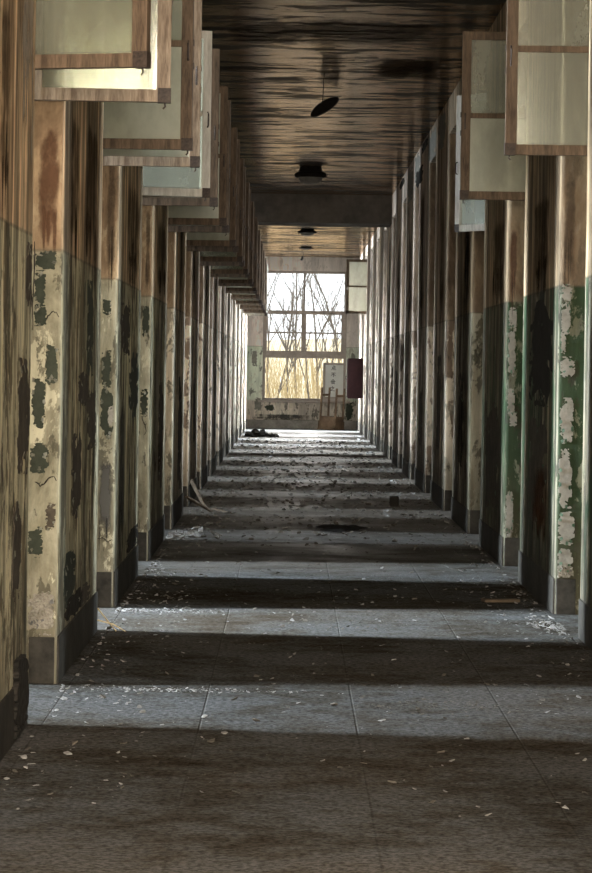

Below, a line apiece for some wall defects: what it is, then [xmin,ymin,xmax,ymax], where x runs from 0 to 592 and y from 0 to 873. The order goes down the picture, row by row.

peeling [17,344,58,474]
peeling [26,242,57,326]
peeling [71,279,164,519]
peeling [485,389,517,537]
peeling [508,307,517,377]
peeling [528,417,547,522]
peeling [529,284,575,407]
peeling [557,398,575,578]